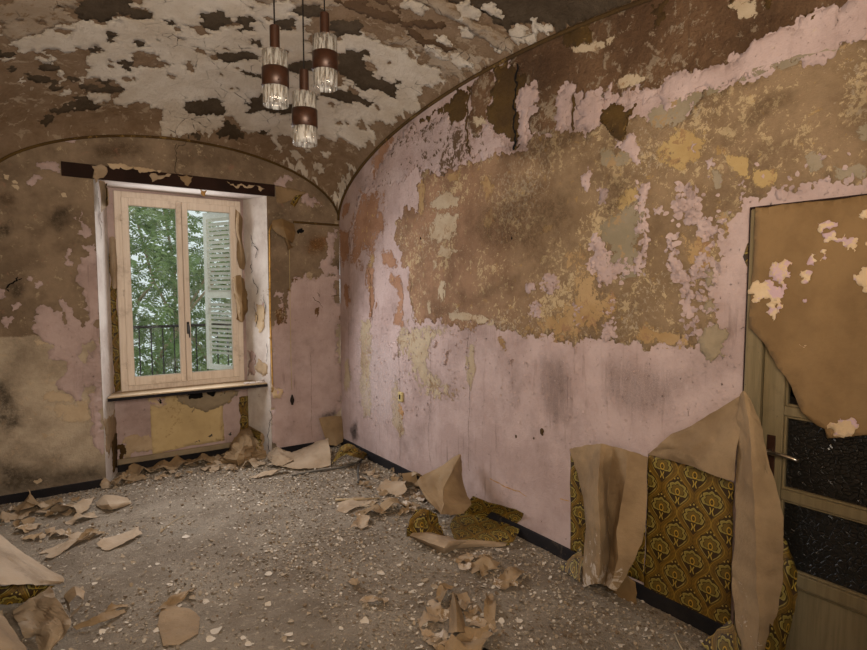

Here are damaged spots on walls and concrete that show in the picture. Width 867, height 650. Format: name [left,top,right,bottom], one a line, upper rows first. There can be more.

peeling [0,0,867,473]